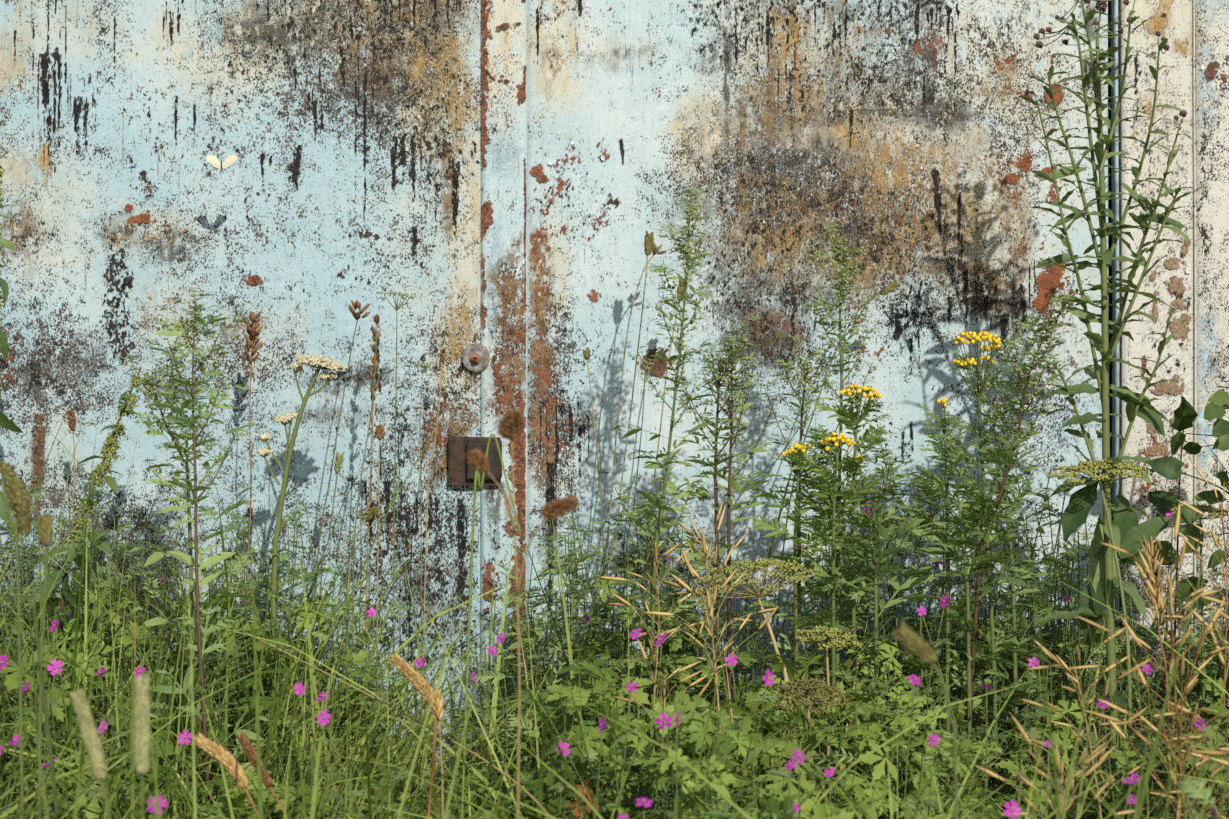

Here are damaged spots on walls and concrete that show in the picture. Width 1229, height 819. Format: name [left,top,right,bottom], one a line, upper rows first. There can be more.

leakage [0,0,99,172]
leakage [260,152,272,192]
leakage [285,47,329,191]
leakage [338,0,416,221]
leakage [386,133,478,243]
leakage [433,0,461,36]
corrosion [408,0,495,168]
corrosion [516,65,527,105]
leakage [674,0,1053,379]
corrosion [730,23,1080,383]
corrosion [397,159,607,677]